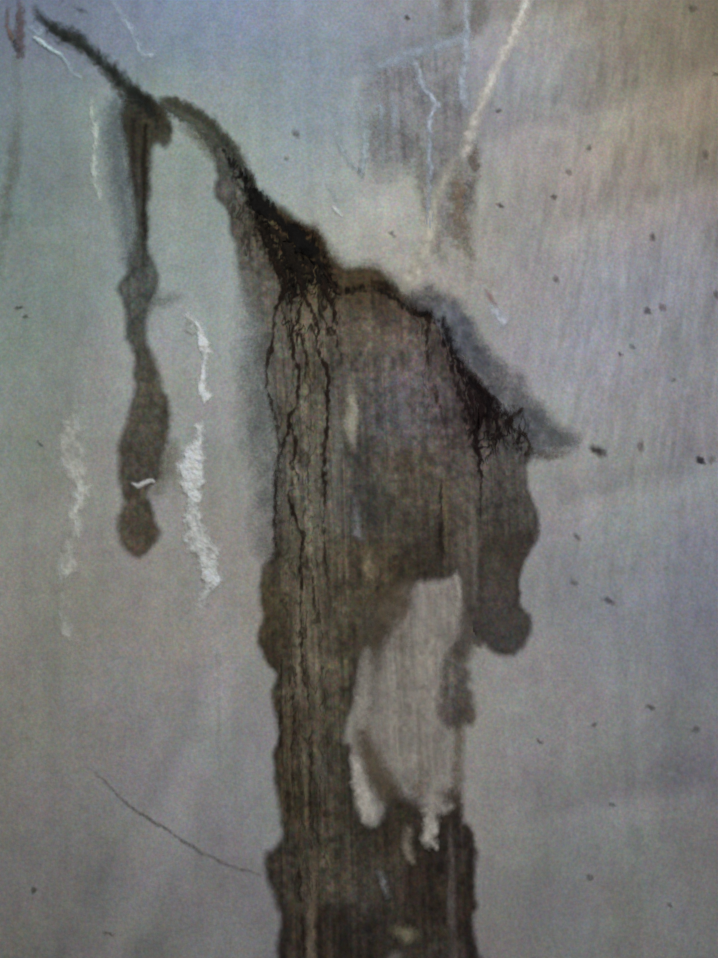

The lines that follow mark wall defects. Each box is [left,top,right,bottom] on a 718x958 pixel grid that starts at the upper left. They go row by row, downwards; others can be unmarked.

efflorescence [59,418,91,588]
damp [89,90,221,608]
crack [40,16,568,696]
damp [214,138,571,958]
damp [416,68,440,128]
damp [459,16,470,99]